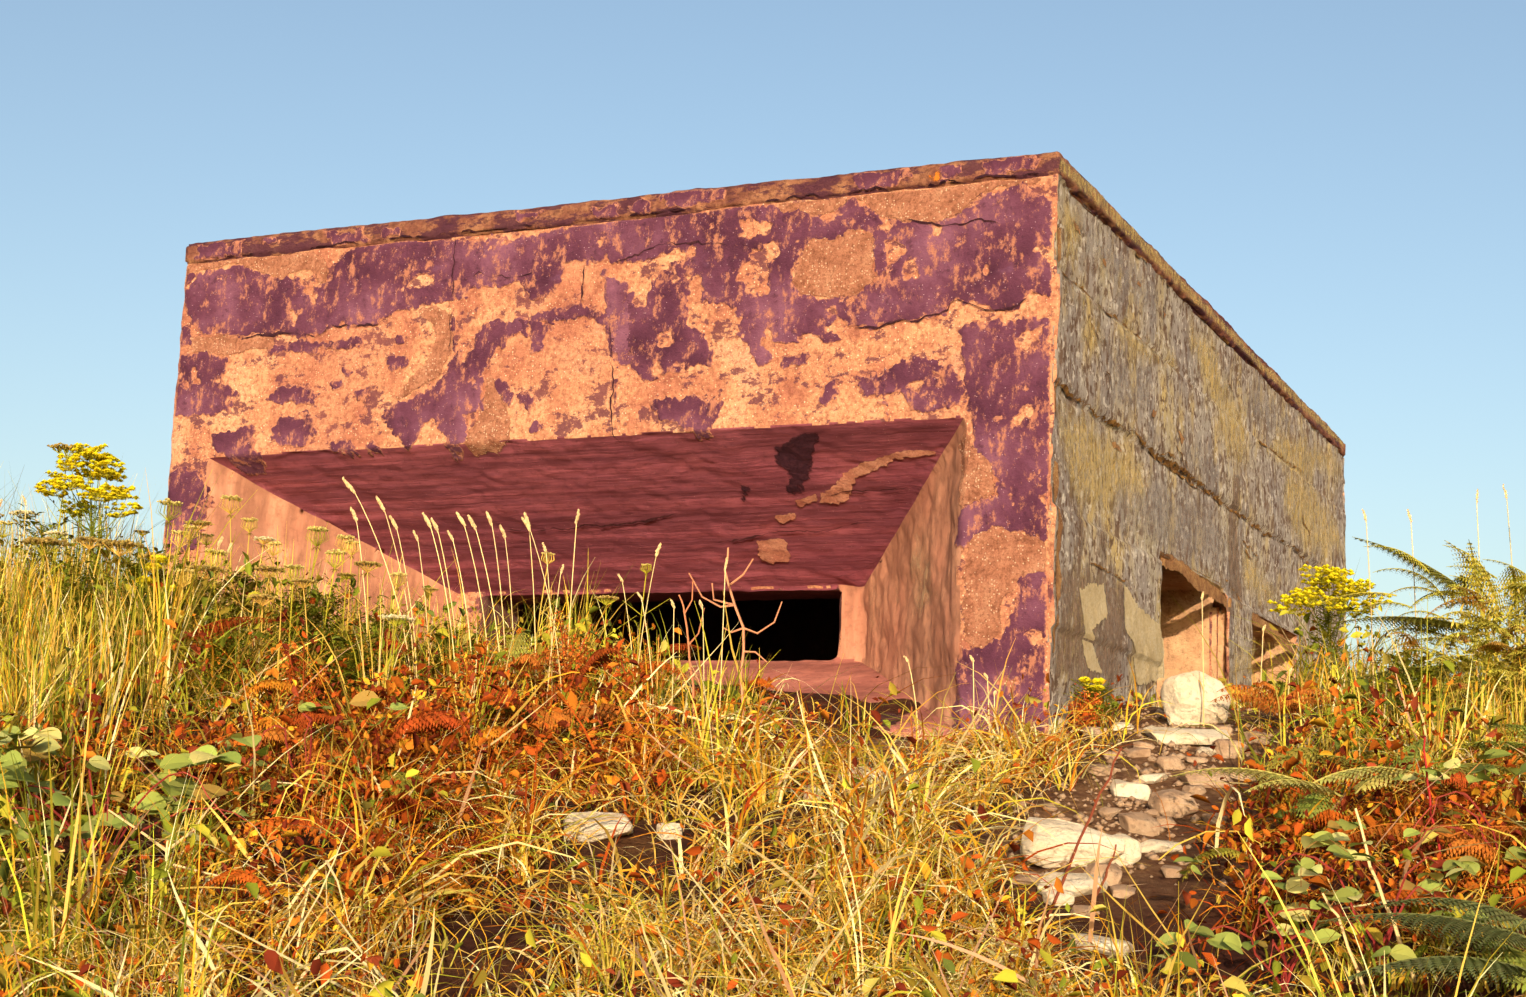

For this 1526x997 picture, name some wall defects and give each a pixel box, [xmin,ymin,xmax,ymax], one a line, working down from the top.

peeling [165,466,215,554]
peeling [174,155,1081,734]
water stain [774,433,819,495]
spalling [1080,583,1165,685]